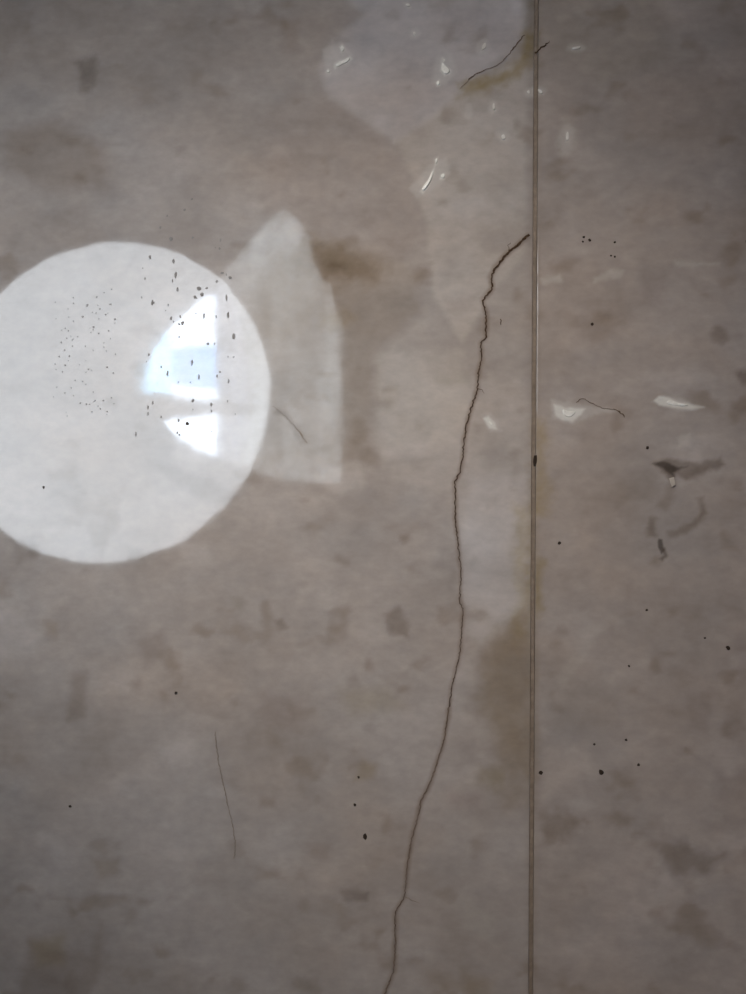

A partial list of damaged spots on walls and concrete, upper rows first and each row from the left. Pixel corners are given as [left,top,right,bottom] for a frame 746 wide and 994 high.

crack [460,35,549,89]
damp [238,226,391,358]
damp [267,364,314,417]
crack [380,230,533,994]
damp [467,603,550,803]
damp [534,801,644,856]